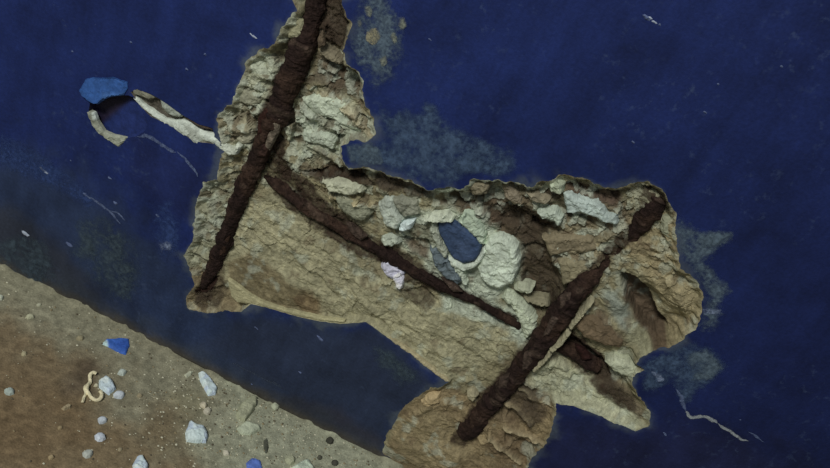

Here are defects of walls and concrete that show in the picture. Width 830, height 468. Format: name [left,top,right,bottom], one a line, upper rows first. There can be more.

peeling [79,77,147,147]
rust [194,0,668,446]
spalling [183,0,729,468]
crack [676,389,763,442]